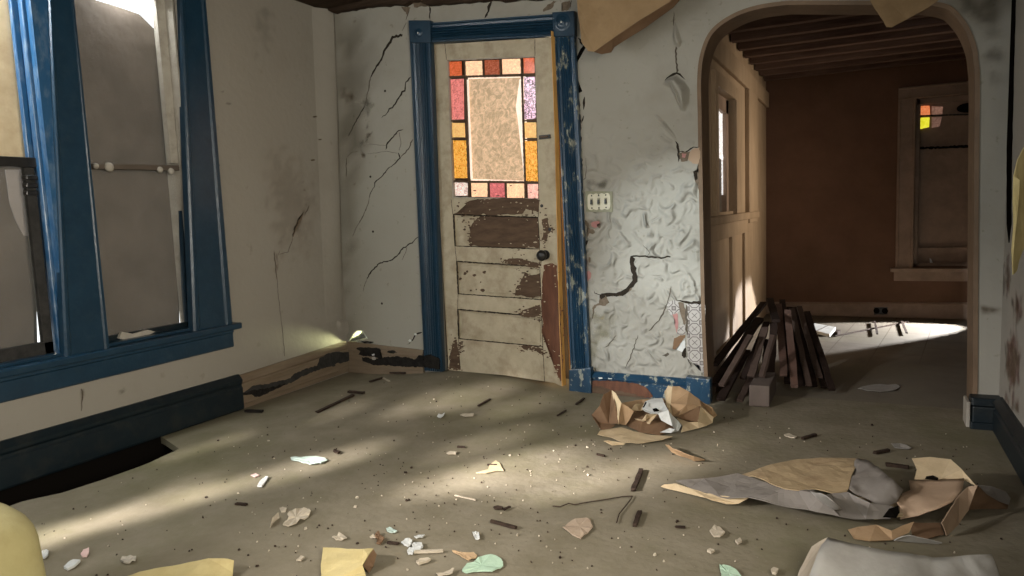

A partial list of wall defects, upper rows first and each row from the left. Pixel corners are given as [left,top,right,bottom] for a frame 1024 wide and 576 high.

crack [346,7,431,235]
spalling [679,147,700,189]
crack [274,206,309,356]
crack [363,237,418,291]
peeling [454,185,566,382]
crack [594,245,671,297]